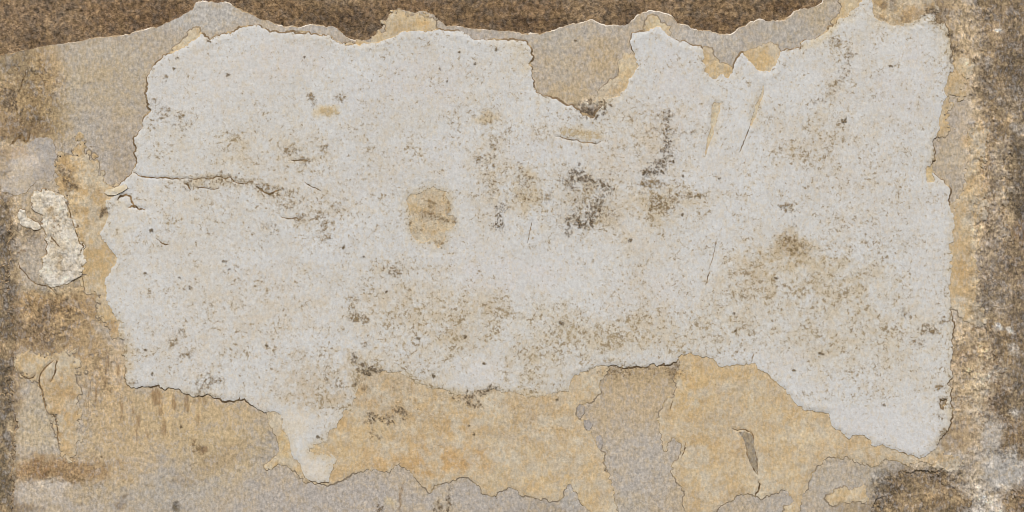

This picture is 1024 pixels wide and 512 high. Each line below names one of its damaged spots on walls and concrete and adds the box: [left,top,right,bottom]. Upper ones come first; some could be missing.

crack [117,172,279,210]
spalling [0,0,862,346]
peeling [309,0,1024,512]